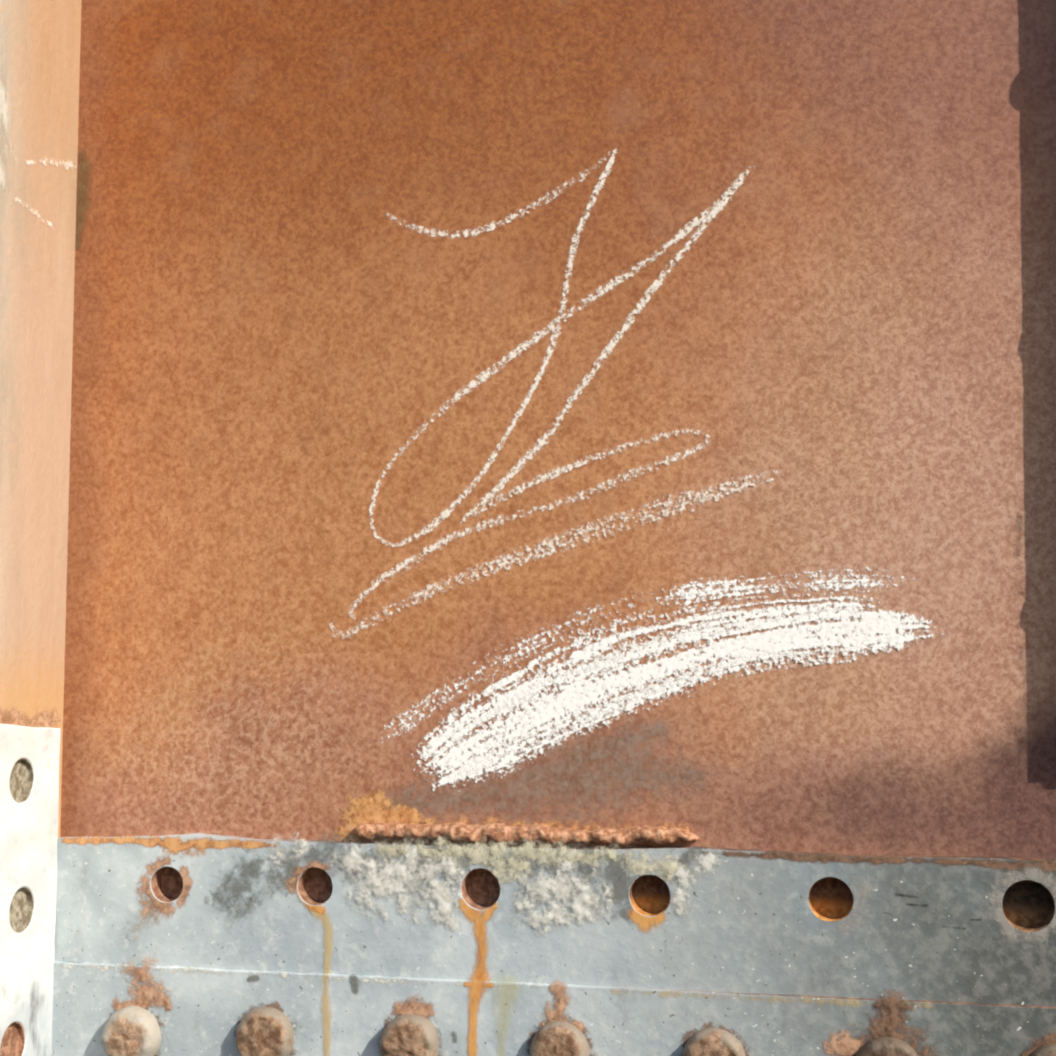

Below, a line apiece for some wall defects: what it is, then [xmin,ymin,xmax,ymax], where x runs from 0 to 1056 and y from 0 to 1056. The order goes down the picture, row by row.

corrosion [335,790,434,842]
corrosion [62,836,277,918]
efflorescence [214,837,720,934]
corrosion [112,958,172,1025]
corrosion [286,861,332,1056]
corrosion [459,898,497,1056]
corrosion [527,980,593,1056]
corrosion [823,990,933,1056]